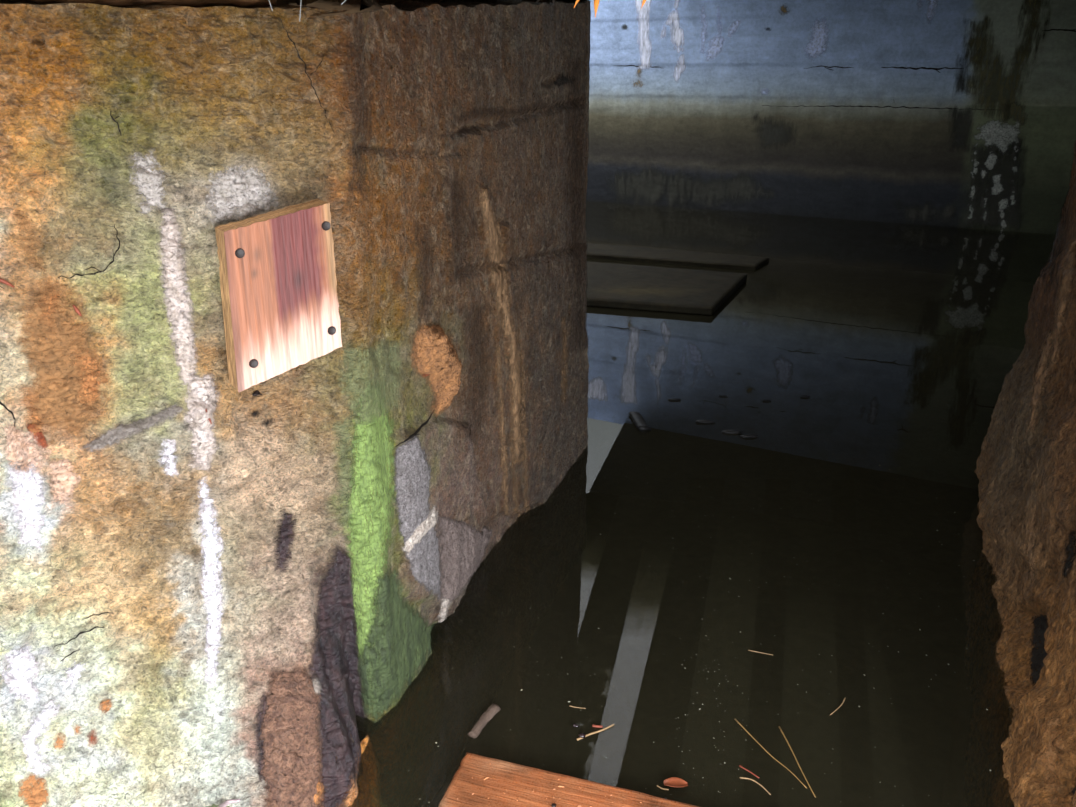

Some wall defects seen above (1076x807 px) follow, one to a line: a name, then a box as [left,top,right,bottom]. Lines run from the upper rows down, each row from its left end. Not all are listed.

leakage [636,0,651,69]
leakage [206,166,278,223]
leakage [951,102,1025,232]
crack [58,224,120,278]
corrosion [19,282,106,449]
leakage [133,150,223,684]
leakage [5,426,81,547]
leakage [275,511,295,571]
leakage [310,546,442,807]
corrosion [54,727,97,749]
leakage [256,695,268,780]
corrosion [19,775,49,807]